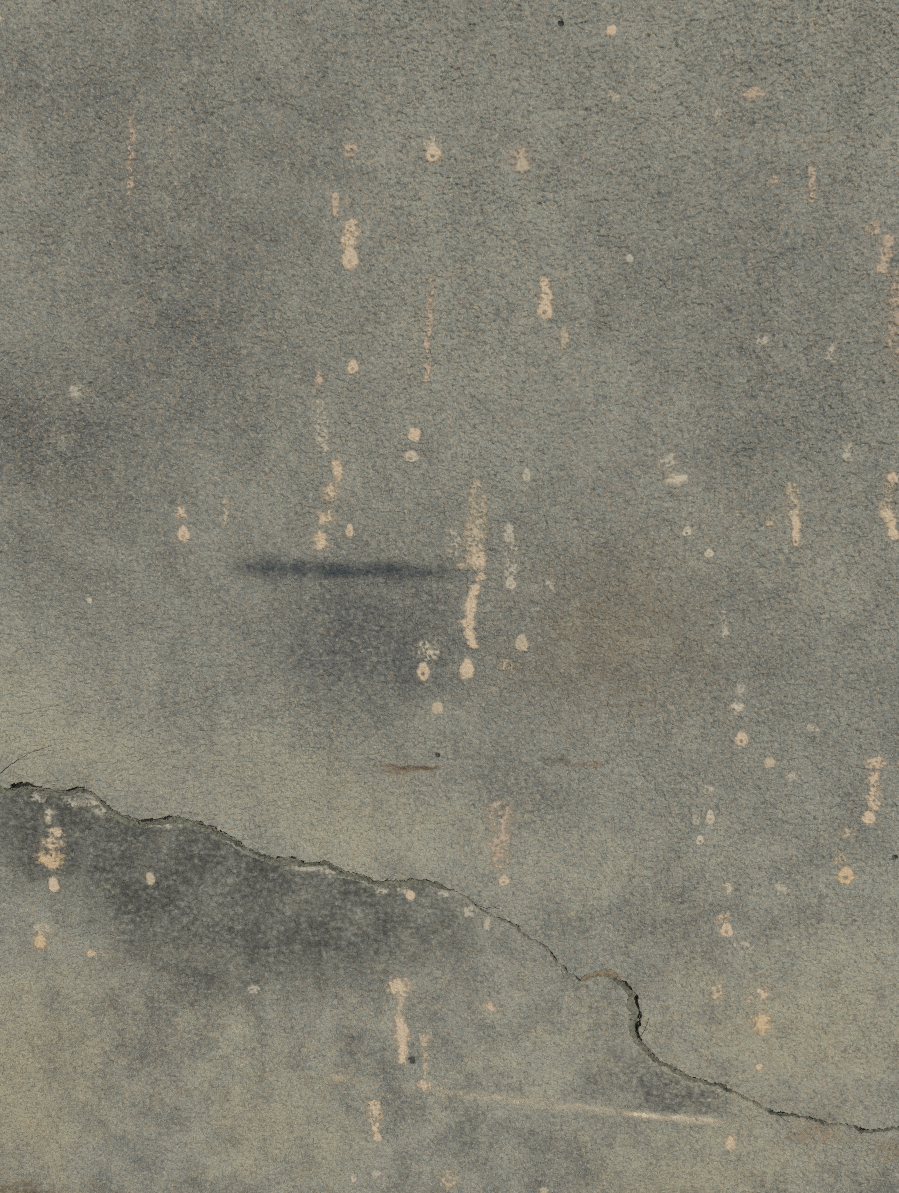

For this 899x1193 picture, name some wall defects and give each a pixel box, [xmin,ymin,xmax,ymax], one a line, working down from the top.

crack [0,745,899,1134]